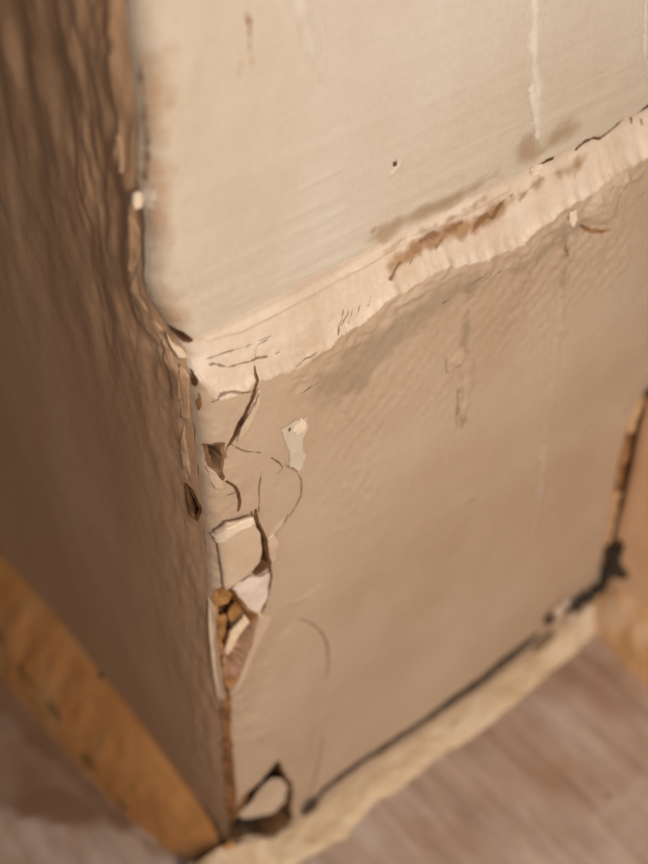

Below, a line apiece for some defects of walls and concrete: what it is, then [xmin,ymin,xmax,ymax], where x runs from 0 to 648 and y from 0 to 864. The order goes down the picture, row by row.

peeling [568,165,632,233]
crack [164,325,302,531]
spalling [207,509,279,701]
spalling [227,761,293,840]